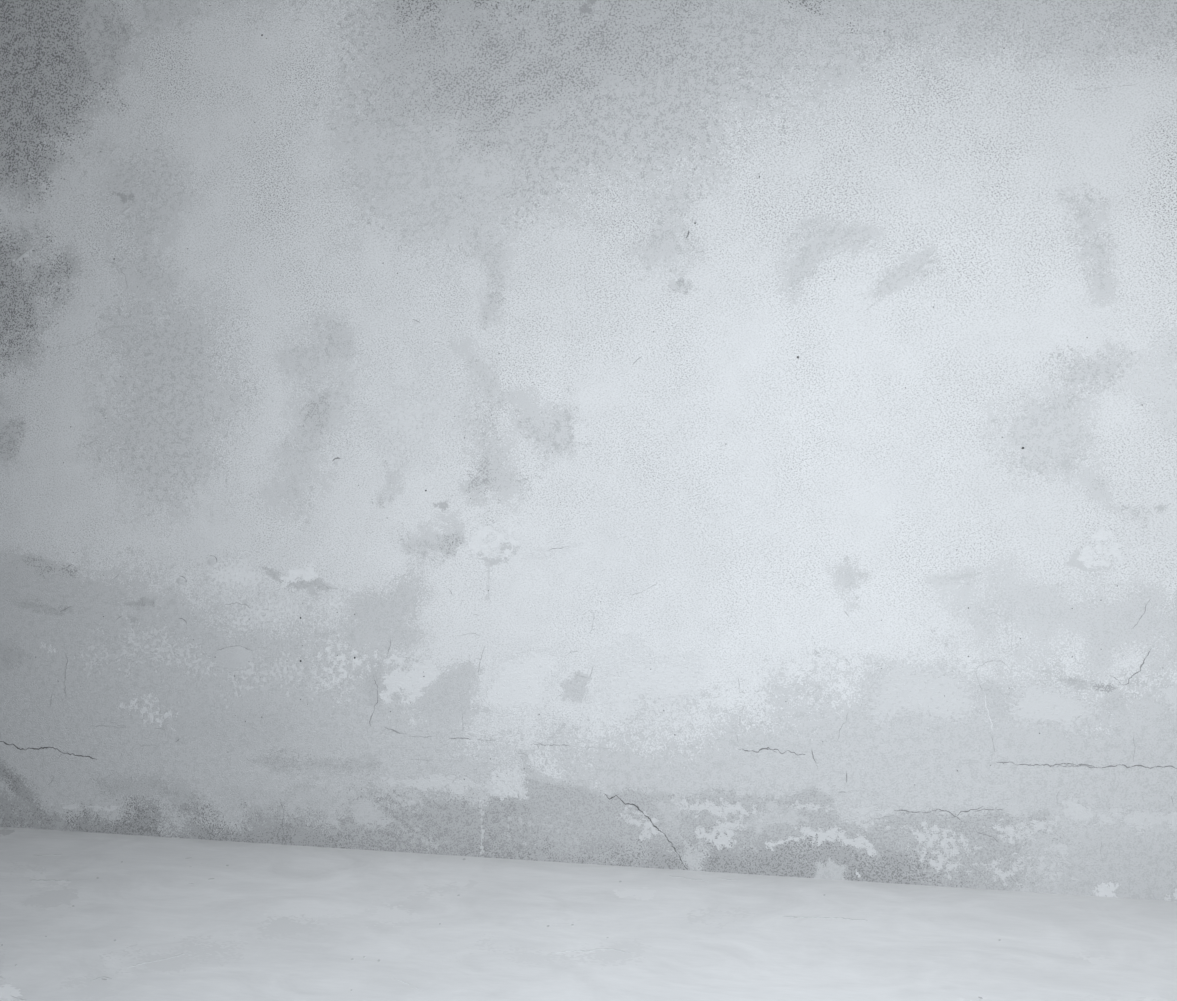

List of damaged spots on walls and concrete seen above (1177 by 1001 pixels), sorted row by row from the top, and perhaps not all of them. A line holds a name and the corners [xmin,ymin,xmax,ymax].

leakage [1055,178,1135,315]
leakage [976,331,1171,532]
crack [0,736,97,782]
crack [737,679,817,800]
crack [976,660,1177,805]
peeling [616,803,667,845]
crack [604,793,688,870]
peeling [670,792,1074,891]